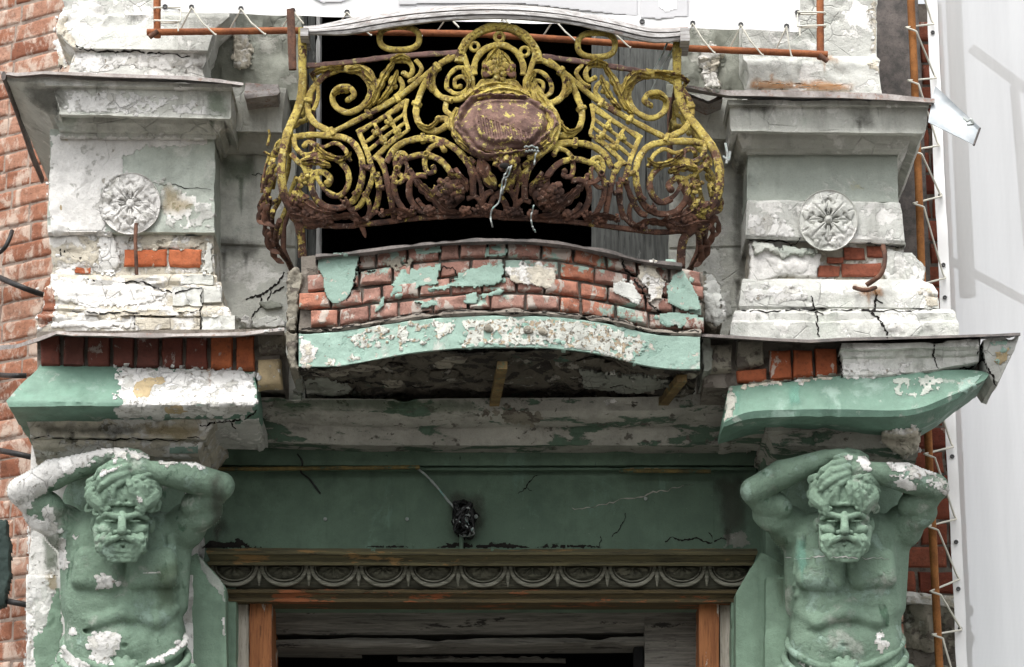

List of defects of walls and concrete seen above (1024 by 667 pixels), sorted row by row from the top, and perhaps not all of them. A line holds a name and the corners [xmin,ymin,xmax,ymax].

flaking render [36,132,217,331]
flaking render [747,213,818,260]
crack [246,272,285,319]
peeling [236,245,672,405]
flaking render [613,246,725,394]
crack [741,289,936,378]
peeling [112,363,262,422]
flaking render [722,360,943,421]
peeling [844,455,872,472]
flaking render [880,424,950,496]
crack [571,484,692,546]
peeling [6,446,205,667]